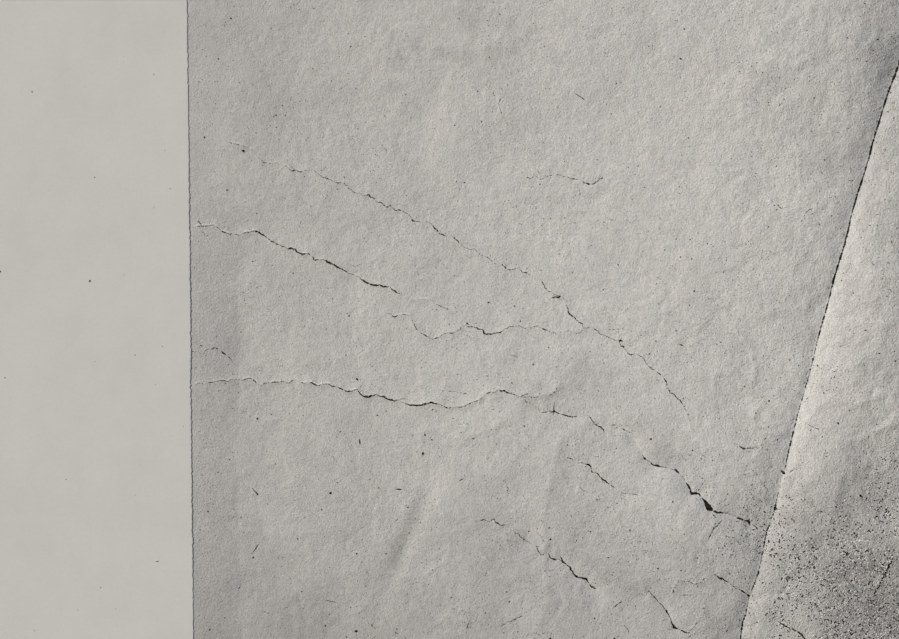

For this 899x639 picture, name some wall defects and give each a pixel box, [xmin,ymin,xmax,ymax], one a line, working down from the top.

crack [190,137,691,421]
crack [192,345,758,539]
crack [475,519,596,589]
crack [643,574,750,639]
crack [873,558,893,594]